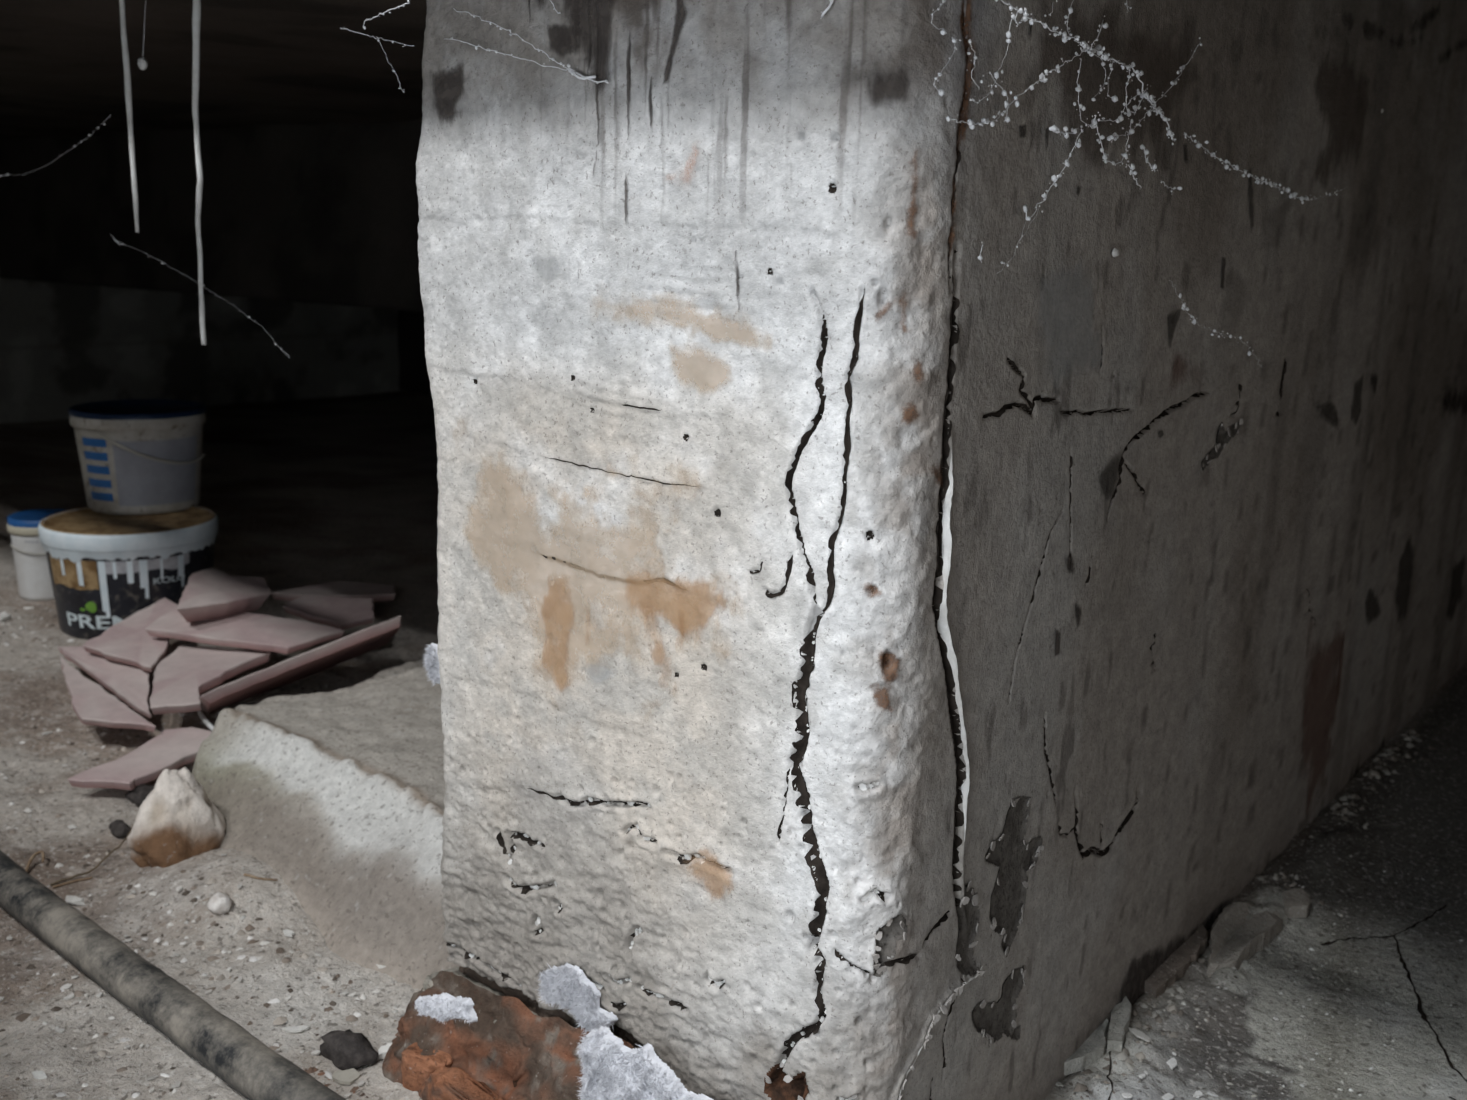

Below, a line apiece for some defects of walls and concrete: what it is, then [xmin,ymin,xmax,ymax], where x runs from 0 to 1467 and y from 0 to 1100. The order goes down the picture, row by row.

crack [750,96,1205,1064]
leakage [414,992,478,1025]
leakage [534,962,714,1100]
peeling [955,796,1044,1044]
crack [1321,905,1467,1100]